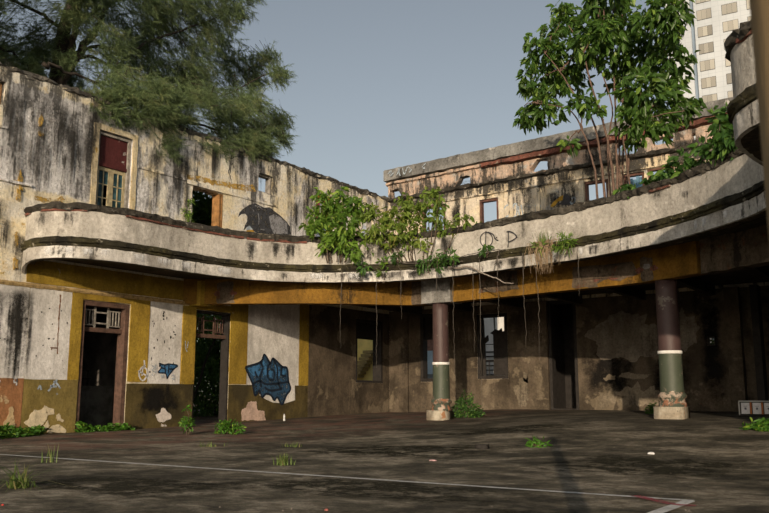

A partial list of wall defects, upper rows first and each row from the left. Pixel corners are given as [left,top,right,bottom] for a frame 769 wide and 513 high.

leakage [5,96,99,191]
leakage [200,147,219,173]
leakage [172,157,189,216]
leakage [495,173,531,208]
leakage [547,170,572,207]
leakage [0,294,33,372]
peeling [585,310,658,362]
peeling [598,372,660,410]
peeling [3,405,66,433]
peeling [156,408,171,427]
peeling [241,401,266,421]